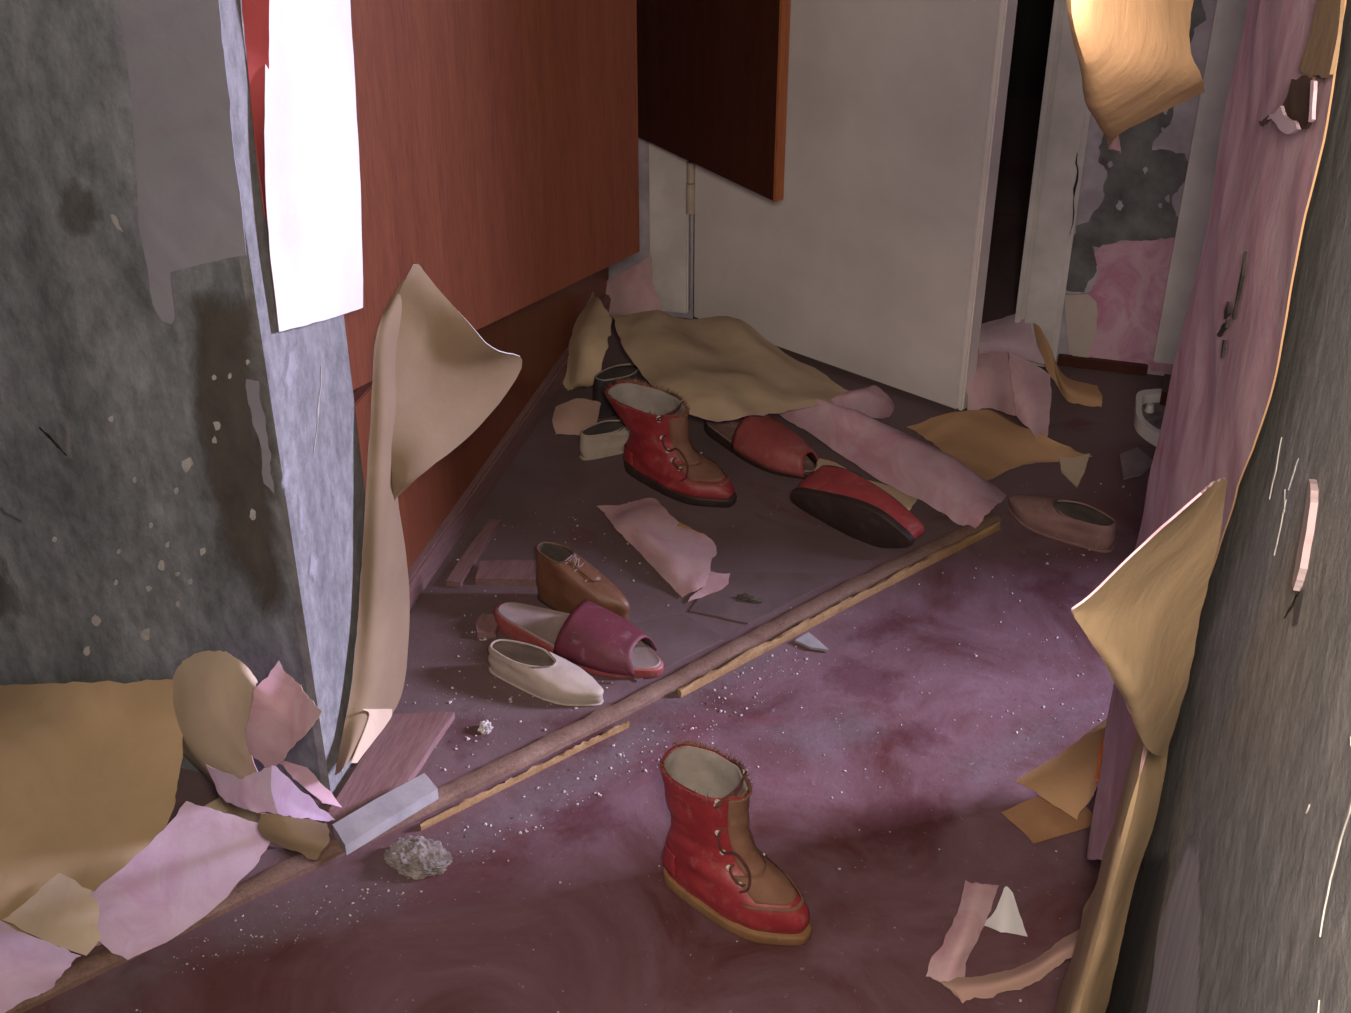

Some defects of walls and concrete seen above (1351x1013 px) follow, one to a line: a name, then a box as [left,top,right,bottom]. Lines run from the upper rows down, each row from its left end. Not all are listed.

flaking render [1189,0,1206,43]
flaking render [1066,107,1188,292]